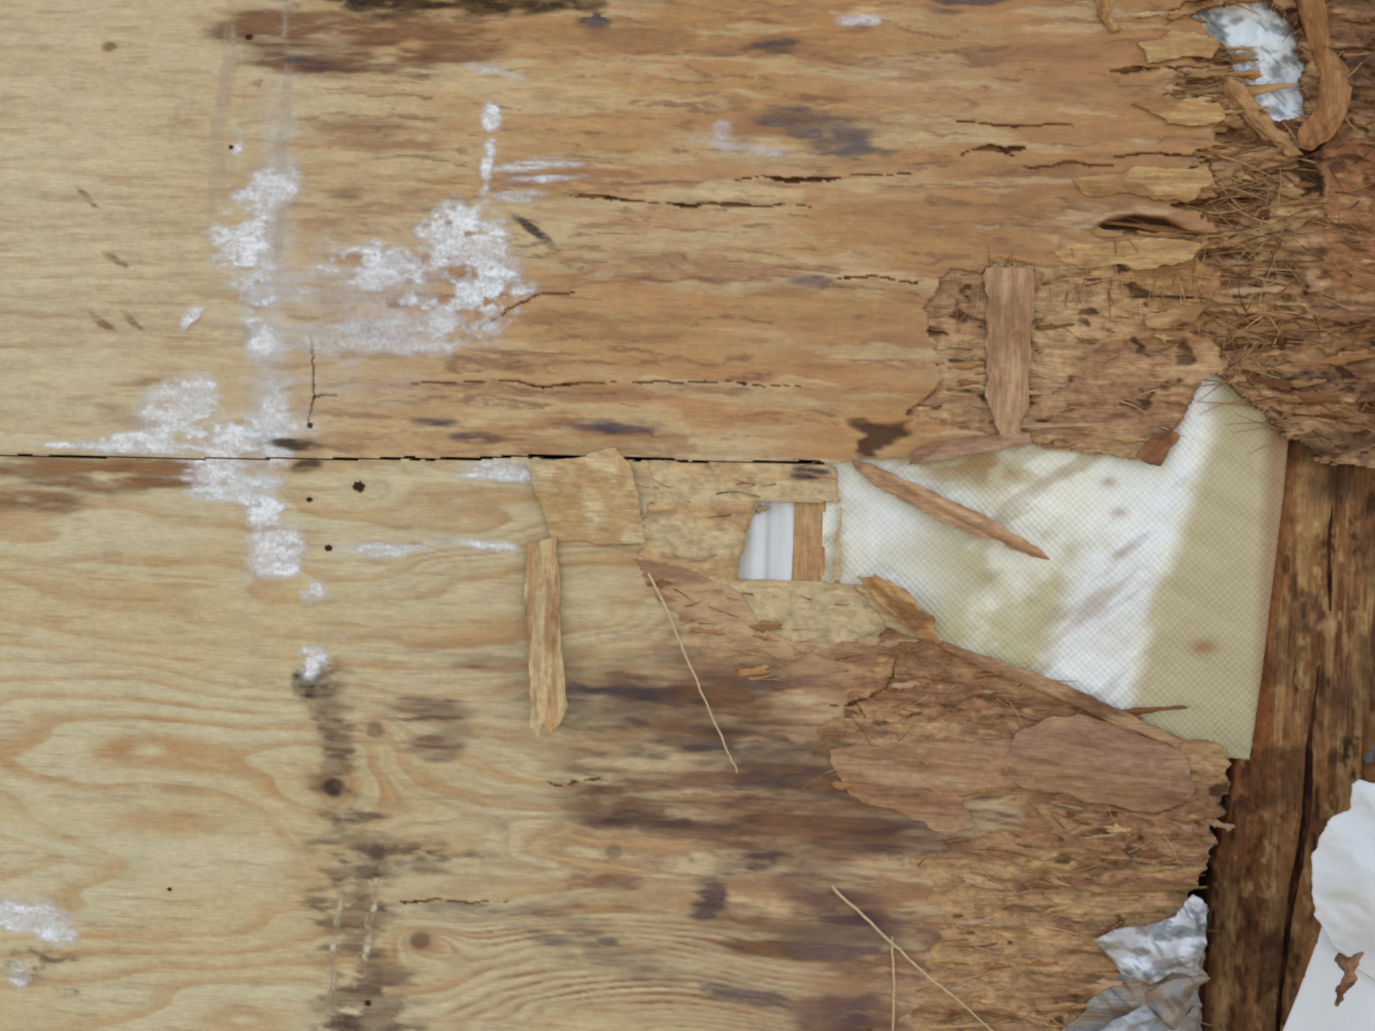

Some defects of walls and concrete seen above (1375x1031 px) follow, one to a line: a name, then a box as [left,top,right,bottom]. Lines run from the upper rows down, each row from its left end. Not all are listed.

water stain [210,169,298,357]
water stain [316,202,533,352]
water stain [480,104,578,195]
crack [571,173,912,209]
peeling [906,221,1375,458]
peeling [1160,45,1301,154]
water stain [0,376,320,578]
peeling [632,459,920,695]
water stain [565,676,928,870]
peeling [1124,705,1187,720]
peeling [1169,819,1235,835]
water stain [311,840,448,1031]